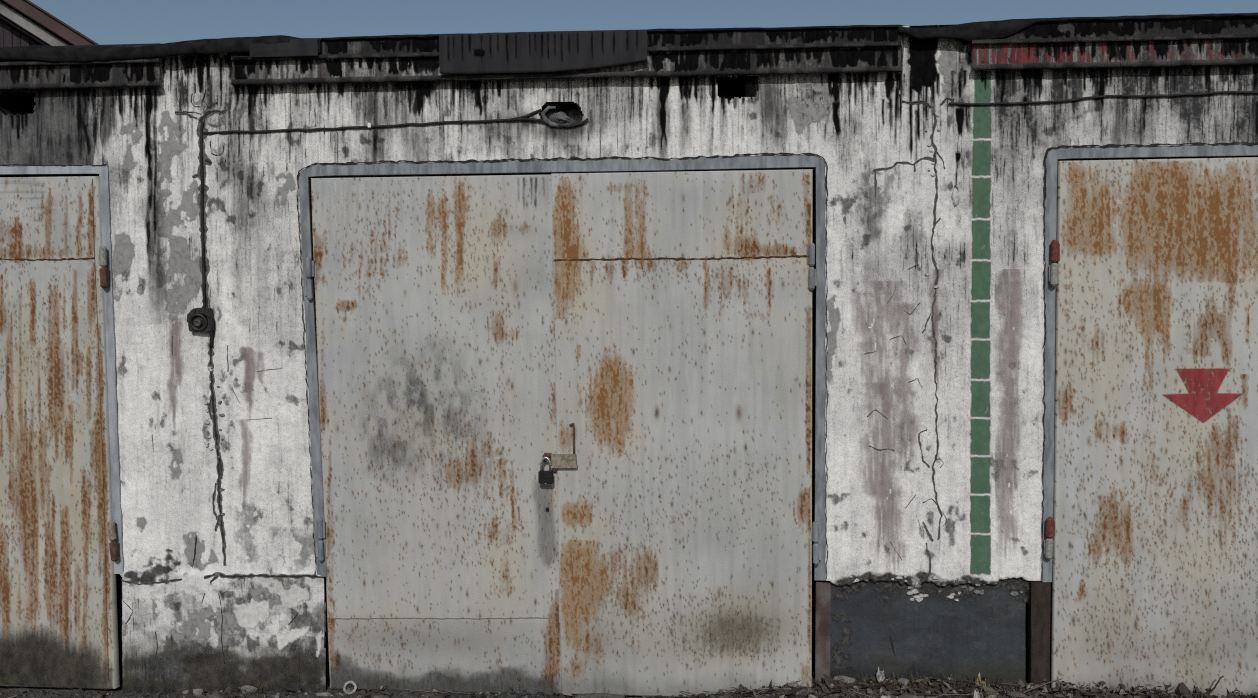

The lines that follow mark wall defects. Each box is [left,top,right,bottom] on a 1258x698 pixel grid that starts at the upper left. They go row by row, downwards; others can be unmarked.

corrosion [0,185,110,684]
water stain [5,53,283,293]
peeling [153,111,202,323]
crack [121,90,324,664]
crack [600,93,618,155]
water stain [296,24,1005,164]
crack [865,97,959,575]
water stain [1019,17,1258,129]
corrosion [1062,161,1258,385]
peeling [169,577,309,661]
corrosion [543,501,658,687]
spalling [837,572,1029,602]